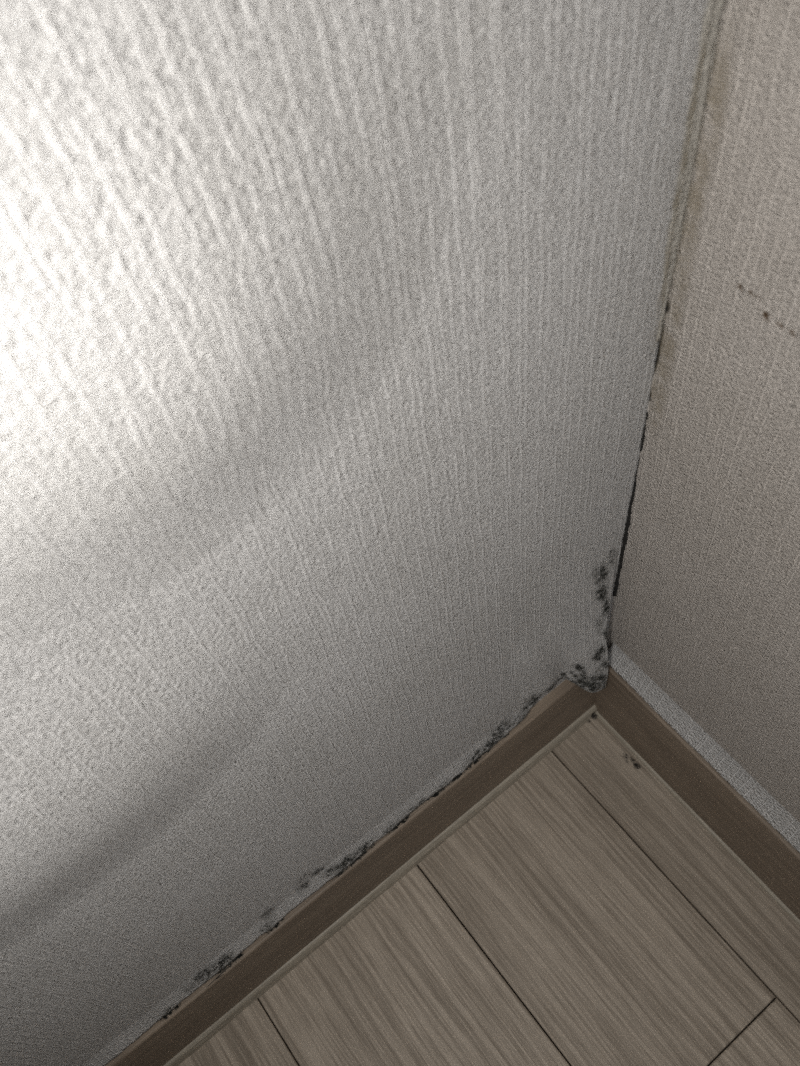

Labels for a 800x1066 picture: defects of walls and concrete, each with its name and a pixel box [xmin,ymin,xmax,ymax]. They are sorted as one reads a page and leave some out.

leakage [384,551,613,834]
leakage [298,840,375,889]
leakage [188,953,244,991]